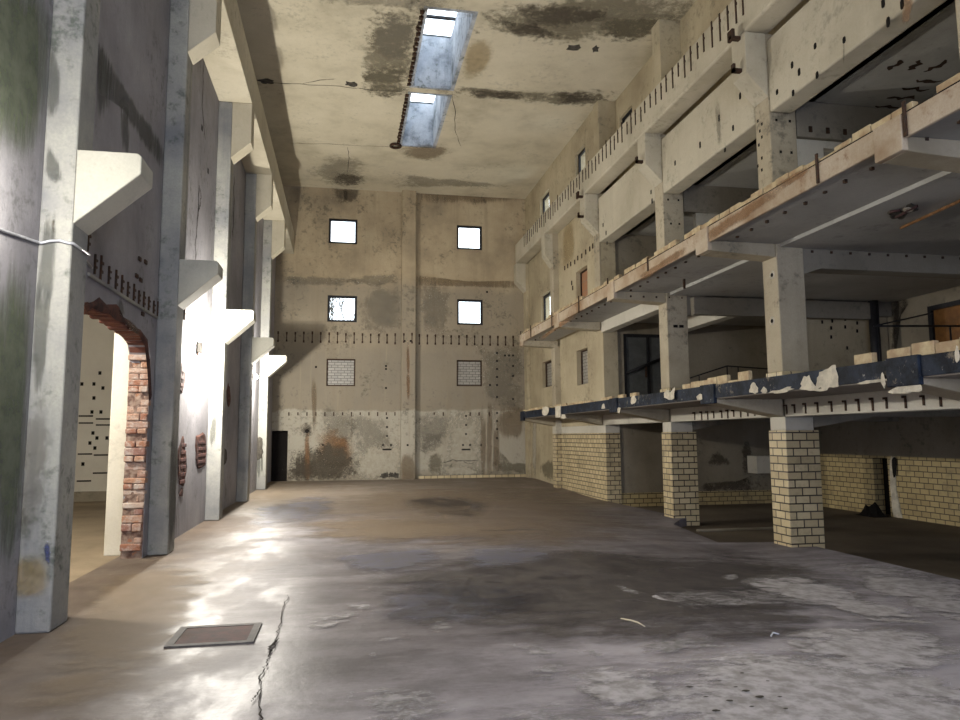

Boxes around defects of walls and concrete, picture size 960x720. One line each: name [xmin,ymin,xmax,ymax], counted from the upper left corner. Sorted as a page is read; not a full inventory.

water stain [486,0,691,41]
water stain [364,2,415,97]
water stain [98,54,160,159]
water stain [463,88,601,106]
peeling [749,365,839,394]
peeling [857,372,922,394]
rust [303,423,349,478]
crack [251,595,289,720]